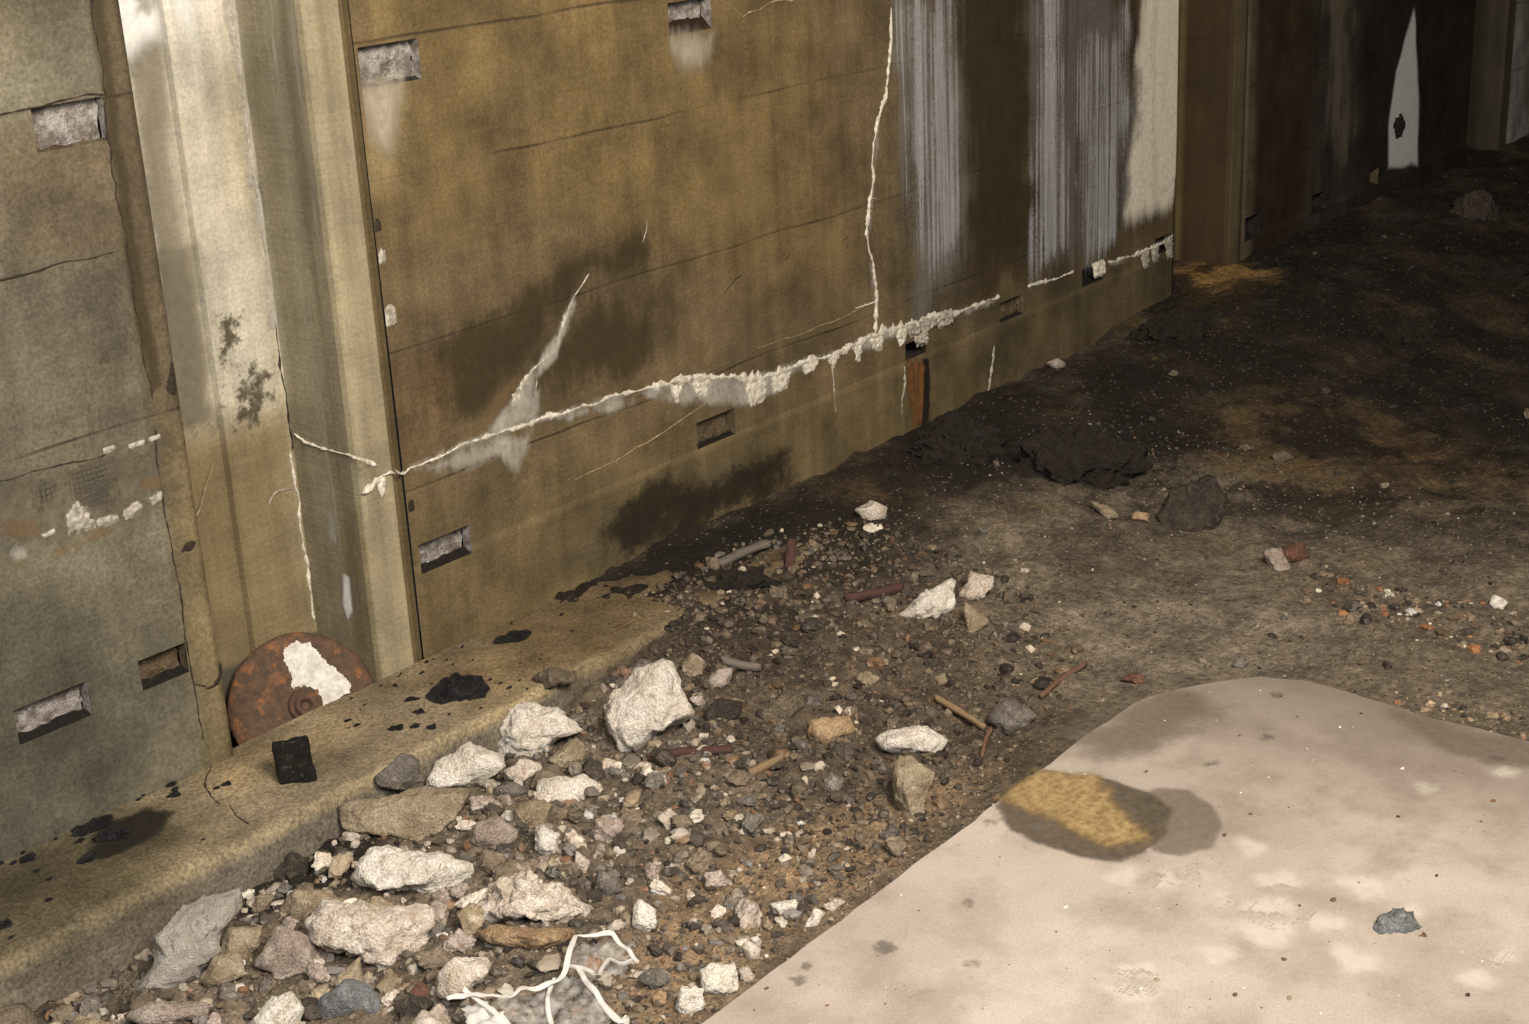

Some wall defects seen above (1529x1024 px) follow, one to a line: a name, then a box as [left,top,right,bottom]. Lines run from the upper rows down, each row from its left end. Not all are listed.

crack [720,0,795,17]
leakage [895,0,960,282]
leakage [1029,0,1179,284]
crack [269,8,1174,620]
leakage [609,451,786,552]